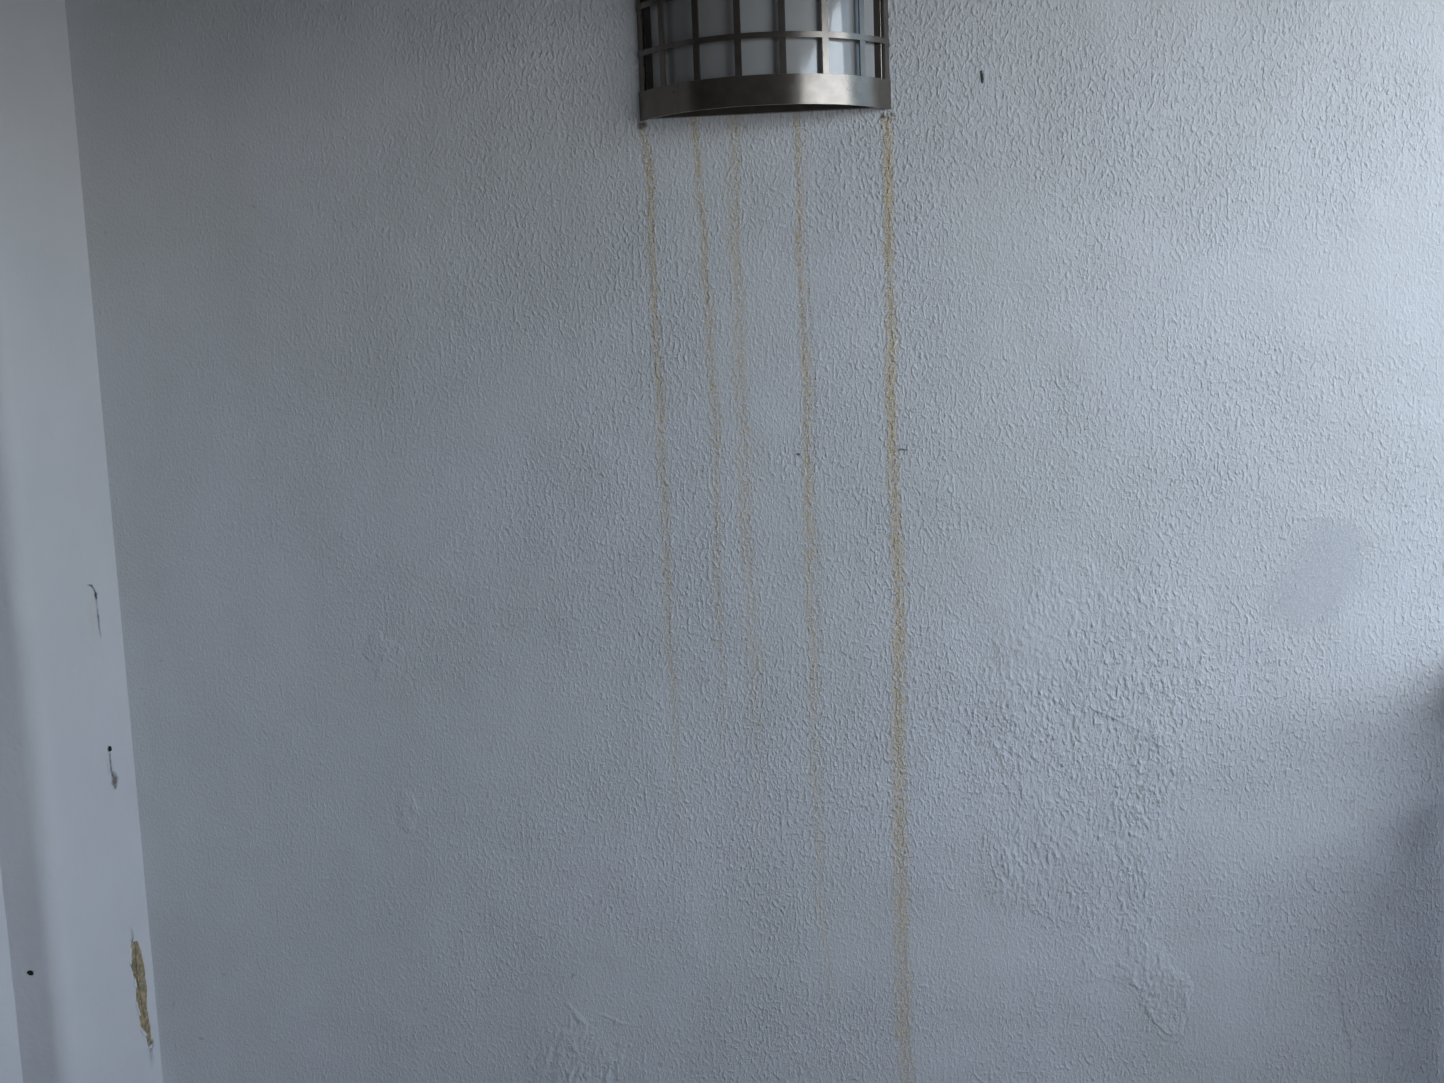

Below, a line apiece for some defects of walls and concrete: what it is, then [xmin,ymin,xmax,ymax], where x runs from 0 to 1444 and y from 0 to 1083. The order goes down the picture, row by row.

rust [638,122,684,847]
rust [881,111,917,1083]